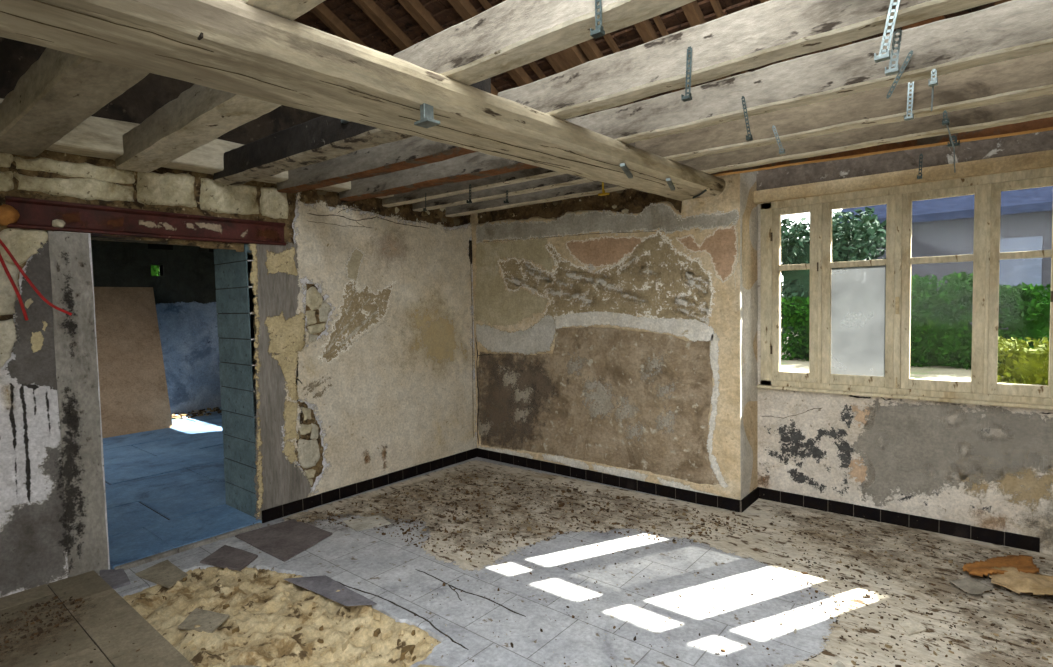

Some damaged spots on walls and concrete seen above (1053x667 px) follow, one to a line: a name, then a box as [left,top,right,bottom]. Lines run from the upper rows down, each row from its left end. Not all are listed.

peeling [30,321,48,353]
water stain [6,383,88,570]
water stain [58,251,77,357]
flaking render [247,242,312,520]
flaking render [297,188,739,496]
peeling [761,403,873,496]